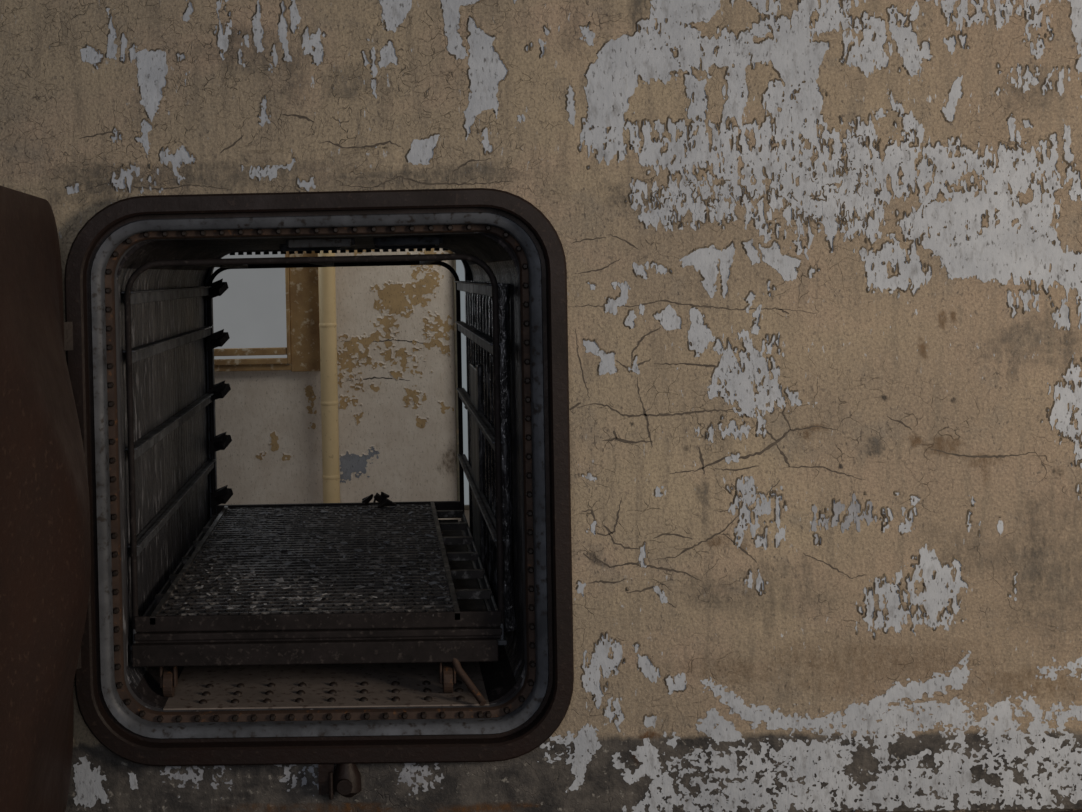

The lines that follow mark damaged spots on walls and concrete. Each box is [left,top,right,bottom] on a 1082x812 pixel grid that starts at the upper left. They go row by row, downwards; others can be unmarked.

peeling [80,6,197,195]
peeling [440,0,509,156]
crack [573,234,638,274]
peeling [565,0,1082,468]
peeling [337,248,454,428]
crack [570,300,815,447]
crack [583,402,865,608]
peeling [855,544,969,641]
peeling [73,756,110,808]
peeling [537,723,602,793]
peeling [580,631,688,732]
peeling [612,650,1082,812]